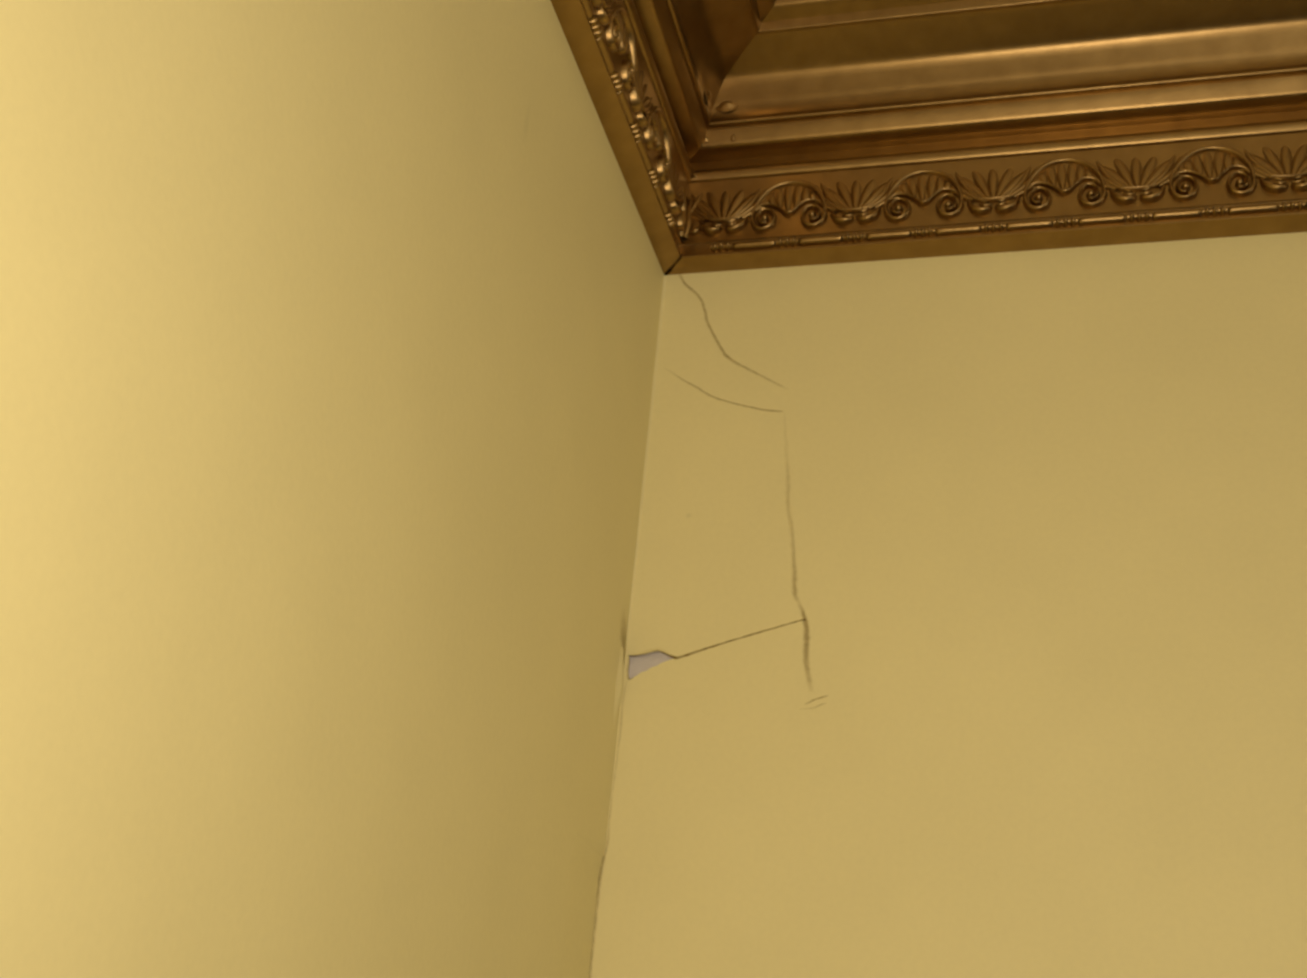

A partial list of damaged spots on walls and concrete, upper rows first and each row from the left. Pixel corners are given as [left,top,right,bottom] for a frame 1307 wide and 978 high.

crack [674,619,805,659]
spalling [628,648,676,679]